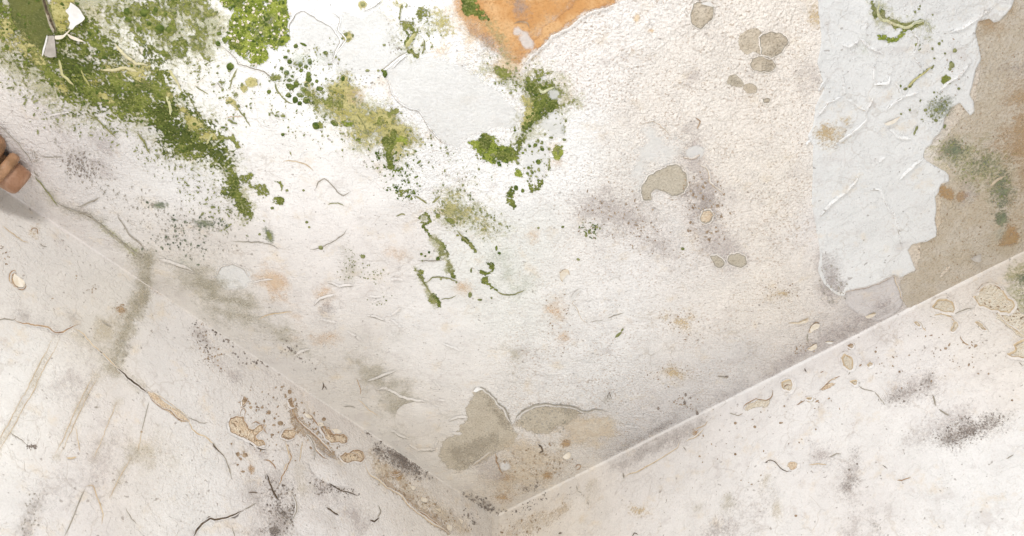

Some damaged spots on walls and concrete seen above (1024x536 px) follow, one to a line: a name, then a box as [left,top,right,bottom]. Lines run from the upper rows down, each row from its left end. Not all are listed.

leakage [54,138,238,268]
leakage [236,31,420,173]
leakage [383,183,427,216]
peeling [738,28,787,73]
peeling [806,0,1024,321]
leakage [900,61,1017,226]
crack [0,318,149,449]
crack [188,421,233,480]
leakage [309,473,360,515]
peeling [227,386,471,536]
leakage [366,433,433,480]
peeling [743,390,773,411]